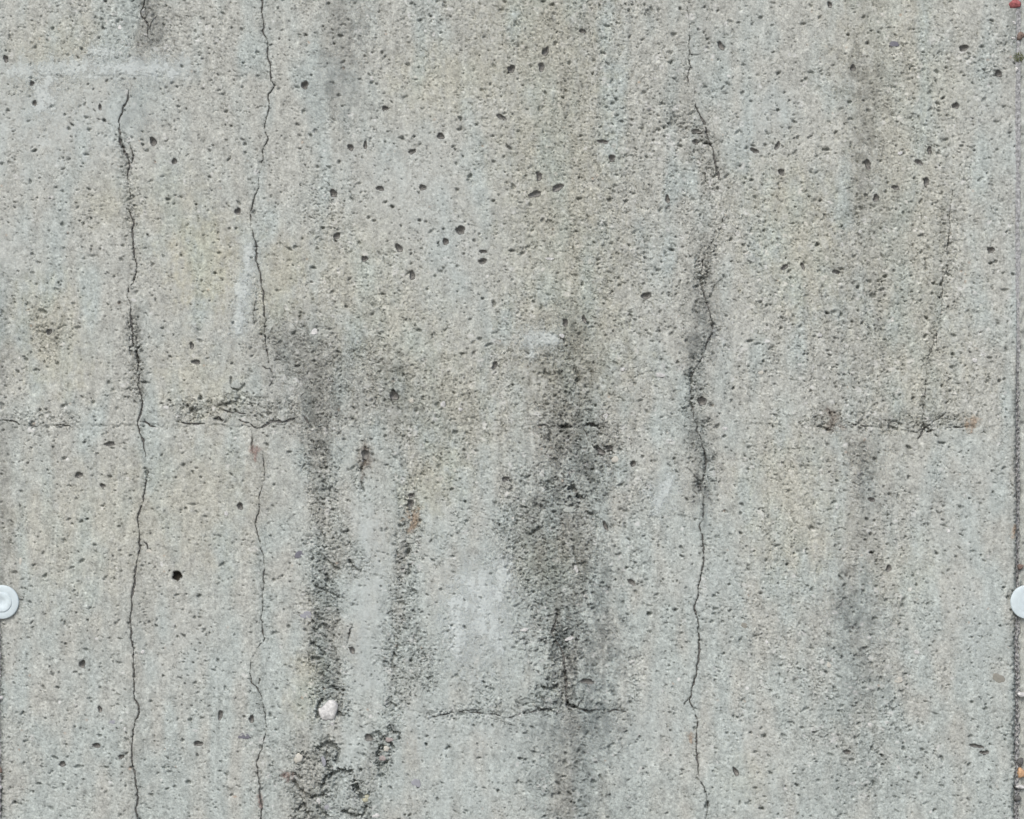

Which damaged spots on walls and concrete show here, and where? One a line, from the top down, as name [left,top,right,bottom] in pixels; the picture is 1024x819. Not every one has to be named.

crack [250,0,275,388]
crack [687,38,720,184]
crack [118,90,155,818]
crack [181,409,309,640]
damp [518,322,563,358]
crack [684,217,724,817]
crack [250,664,266,819]
crack [434,609,626,725]